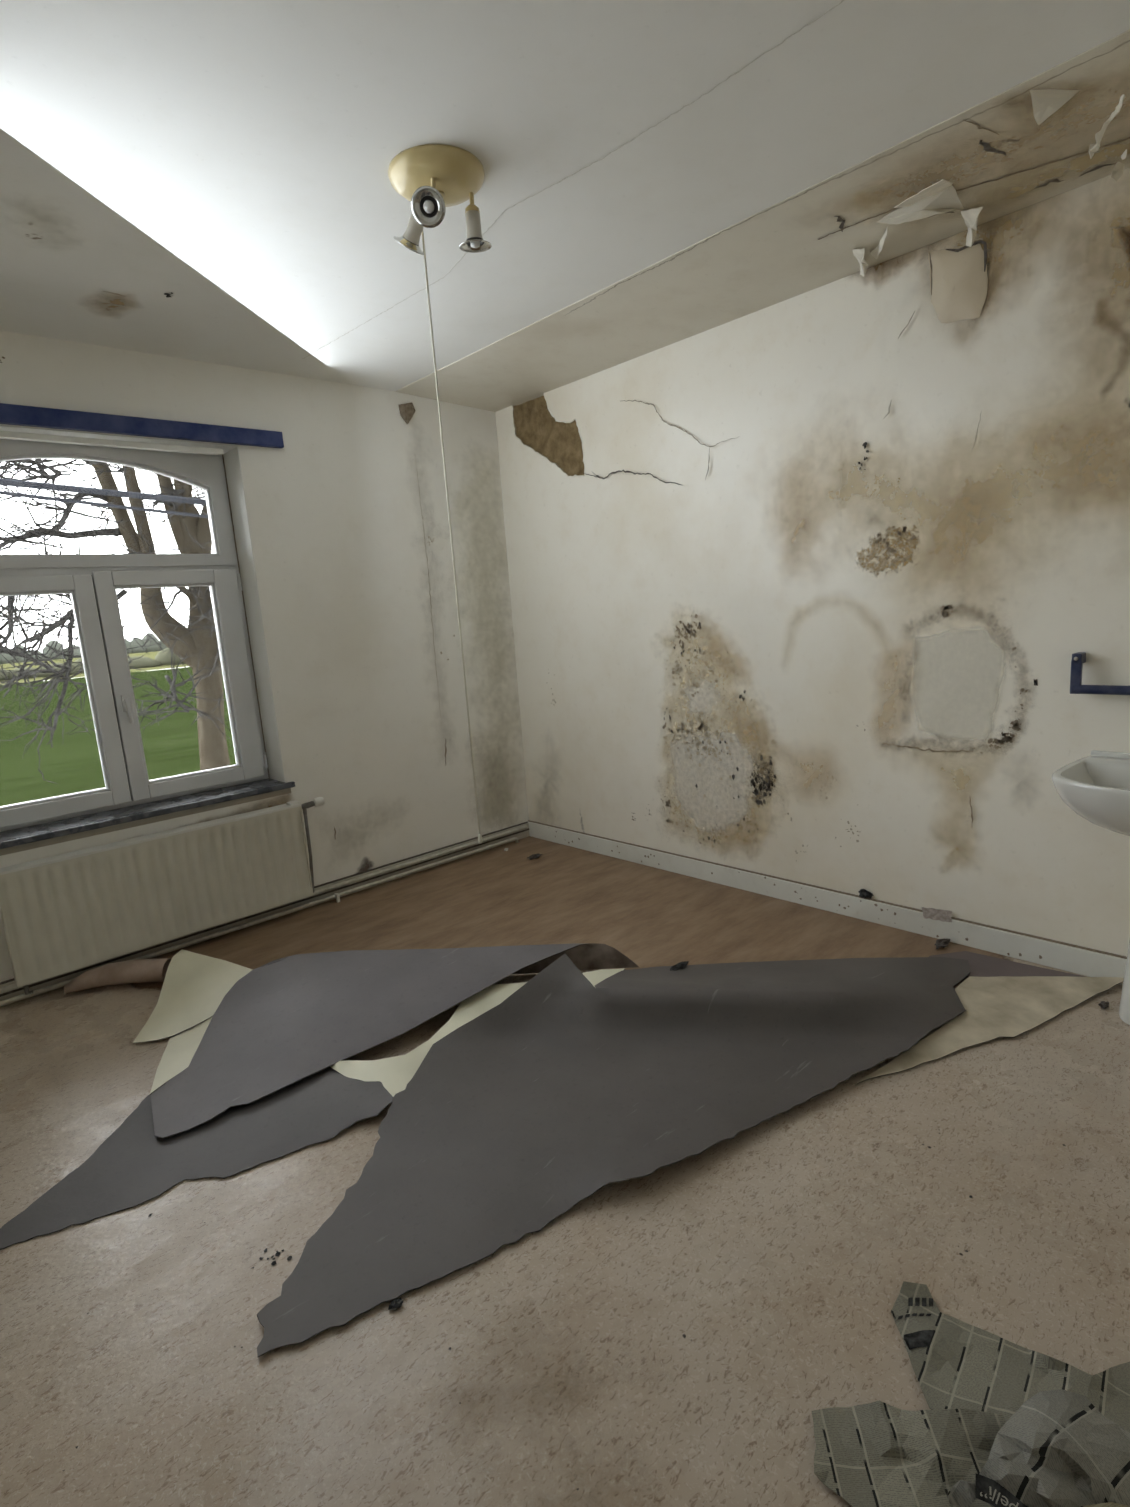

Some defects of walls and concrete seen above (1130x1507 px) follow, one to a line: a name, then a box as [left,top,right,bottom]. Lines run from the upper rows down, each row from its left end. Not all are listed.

peeling [1030,89,1080,125]
peeling [1088,94,1126,158]
peeling [853,179,983,277]
damp [866,253,907,276]
flaking render [399,402,415,424]
flaking render [512,393,586,477]
crack [586,400,735,486]
damp [858,525,918,575]